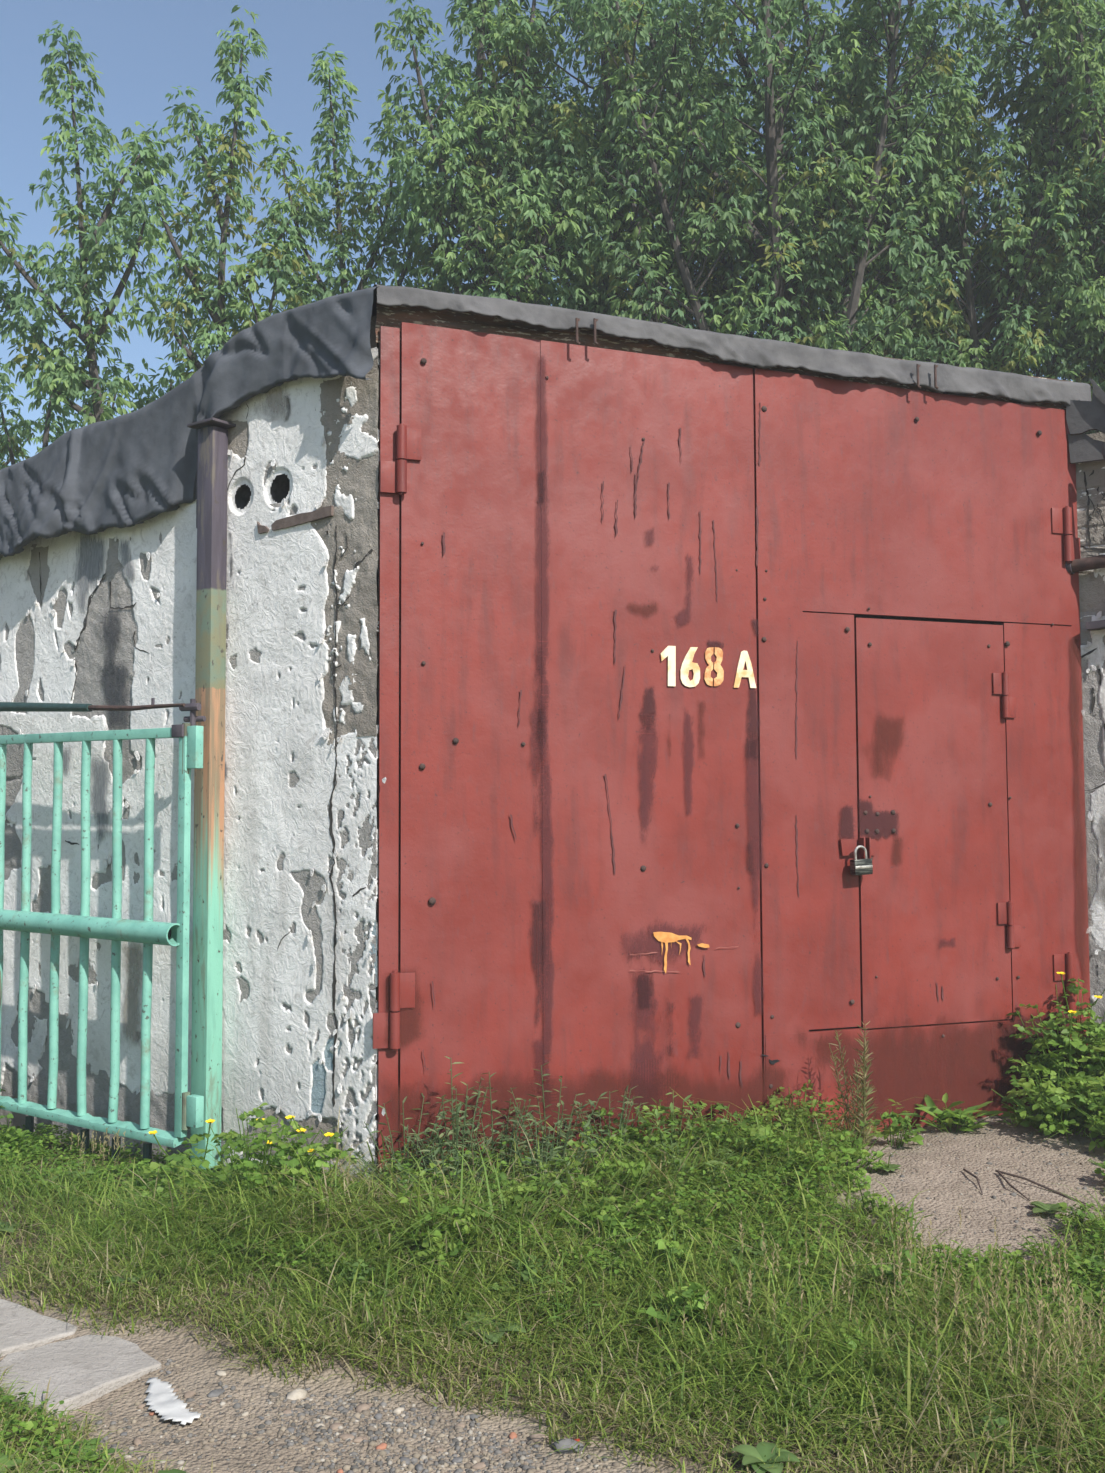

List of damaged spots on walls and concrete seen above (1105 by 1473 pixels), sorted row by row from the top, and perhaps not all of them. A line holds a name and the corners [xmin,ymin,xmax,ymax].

spalling [32,864,51,913]
spalling [0,532,162,880]
spalling [0,943,191,1166]
spalling [92,840,156,890]
peeling [200,358,386,1177]
crack [328,526,373,1107]
rust [391,359,783,1150]
rust [840,799,900,862]
spalling [1076,460,1105,1055]